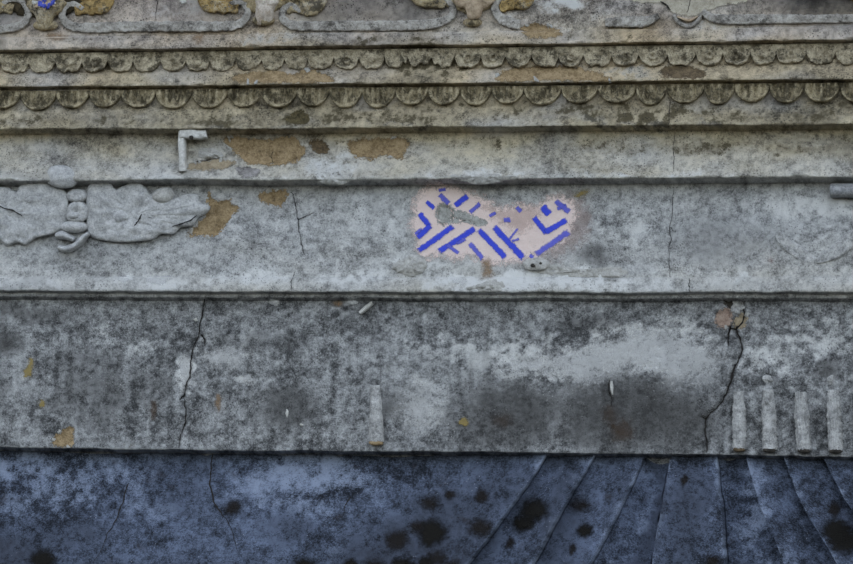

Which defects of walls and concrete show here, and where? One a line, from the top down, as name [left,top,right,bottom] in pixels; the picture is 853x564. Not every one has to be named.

spalling [285,109,310,125]
spalling [187,134,330,178]
spalling [347,135,410,162]
spalling [185,191,239,239]
spalling [258,188,290,209]
crack [291,192,315,255]
crack [179,299,205,446]
crack [703,309,745,452]
spalling [50,424,75,448]
crack [93,483,129,562]
crack [209,454,239,553]